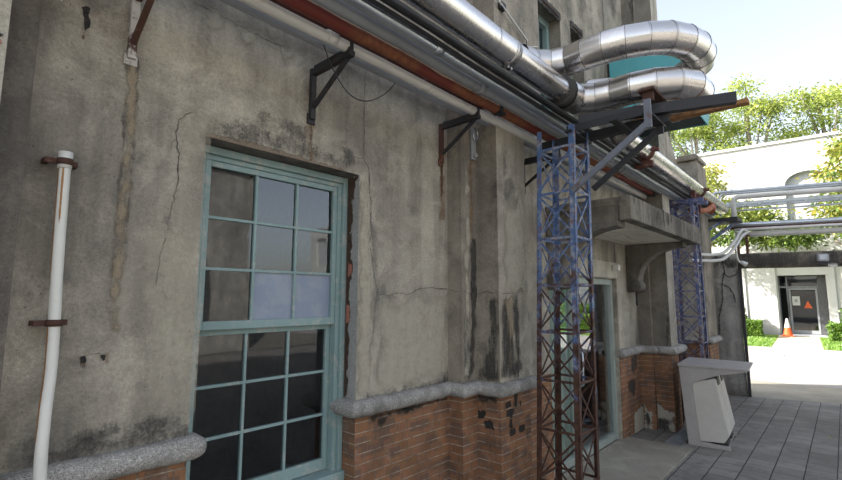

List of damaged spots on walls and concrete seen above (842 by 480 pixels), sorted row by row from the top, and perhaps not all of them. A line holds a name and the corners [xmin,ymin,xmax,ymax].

crack [156,112,194,317]
spalling [205,133,343,171]
spalling [344,176,358,397]
crack [357,73,527,389]
water stain [468,239,523,381]
flaking render [634,403,675,433]